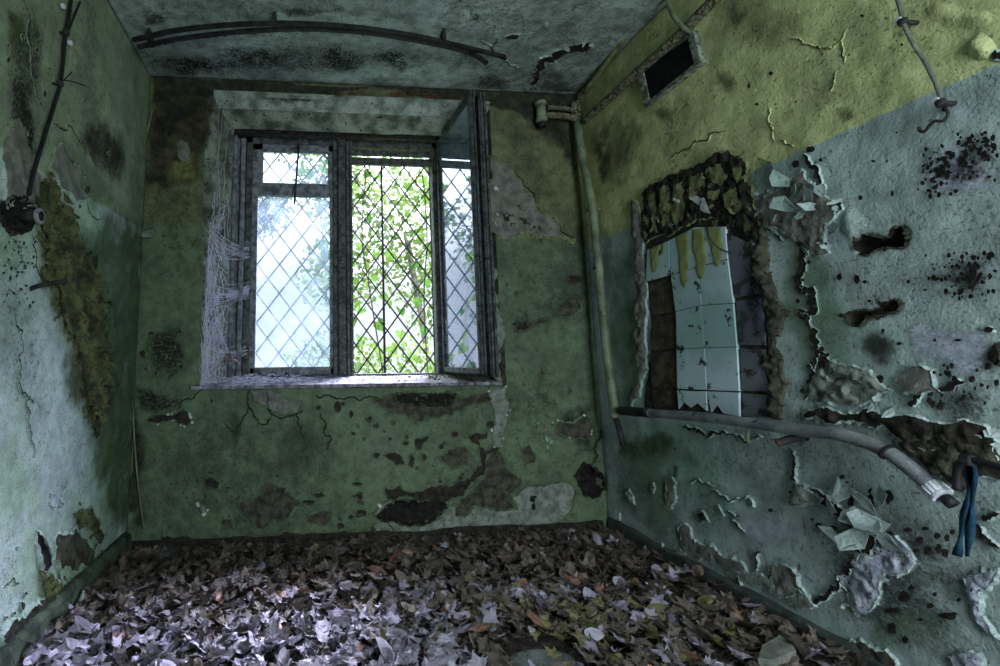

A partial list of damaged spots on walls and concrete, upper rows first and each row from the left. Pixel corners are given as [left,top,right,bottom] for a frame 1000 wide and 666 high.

leakage [12,24,43,161]
crack [789,28,848,91]
peeling [489,156,577,244]
spalling [917,131,999,199]
spalling [923,250,997,300]
crack [12,310,36,458]
crack [226,391,380,450]
flaking render [372,274,594,533]
spalling [800,342,1000,494]
crack [1,577,20,589]
flaking render [34,524,96,575]
spalling [789,474,921,644]